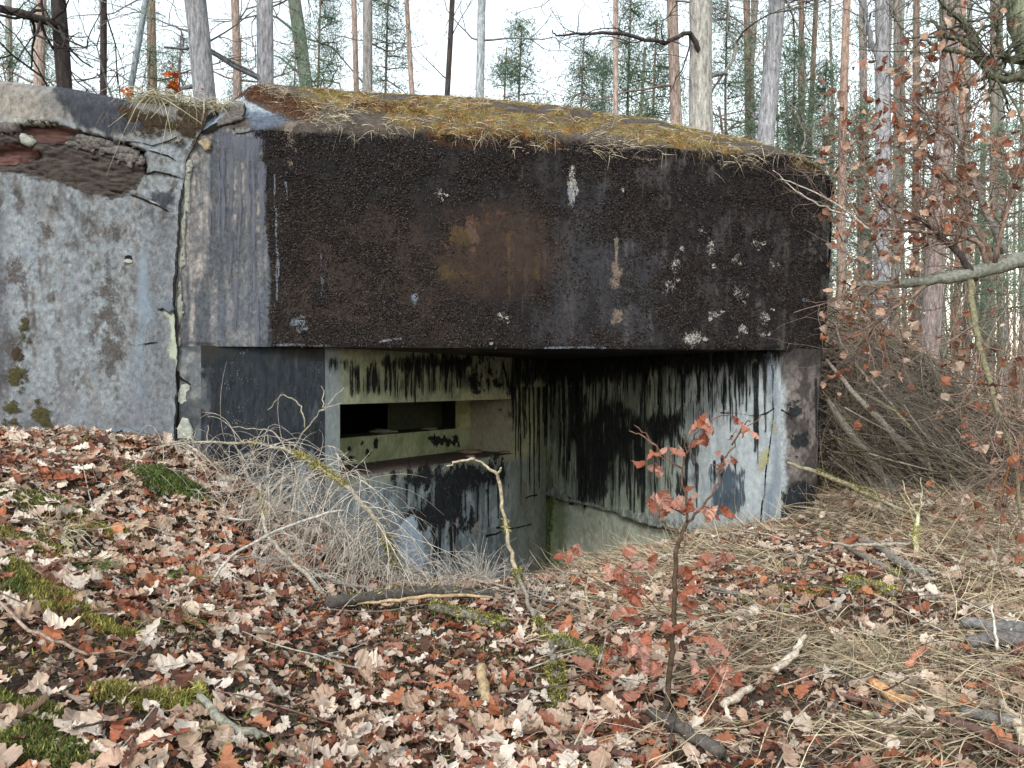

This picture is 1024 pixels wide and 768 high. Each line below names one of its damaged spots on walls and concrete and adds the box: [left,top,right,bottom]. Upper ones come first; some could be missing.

spalling [0,118,147,199]
crack [83,103,251,441]
leakage [684,331,707,345]
leakage [342,356,699,572]